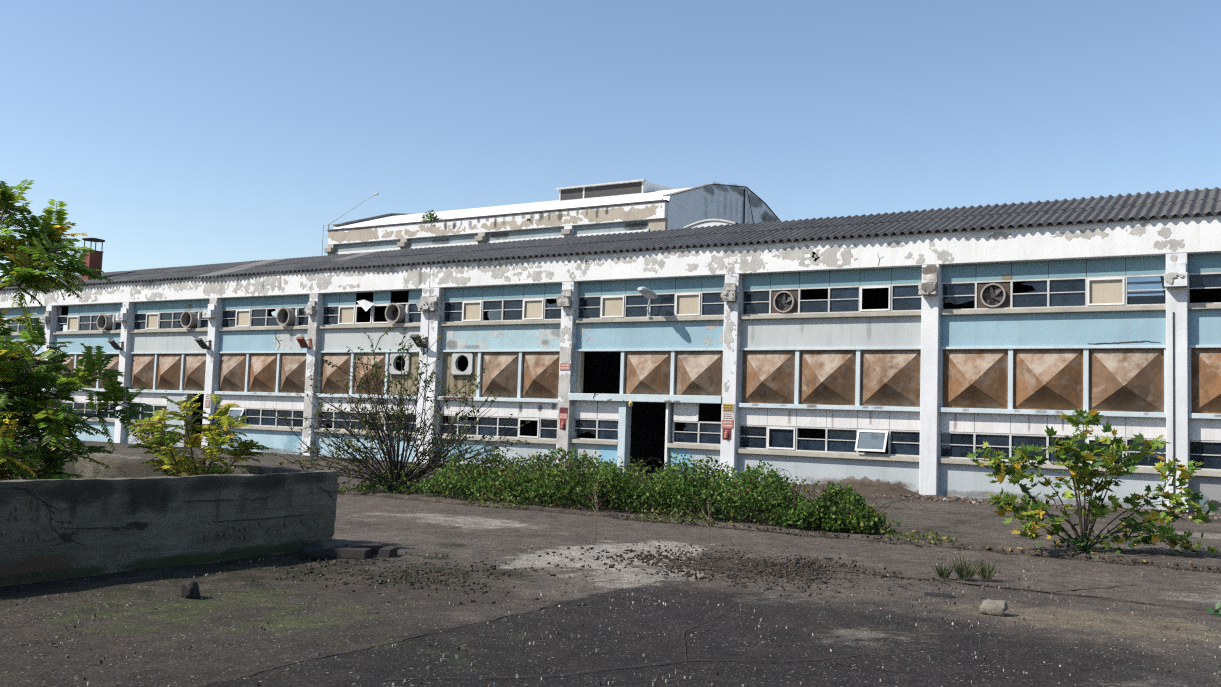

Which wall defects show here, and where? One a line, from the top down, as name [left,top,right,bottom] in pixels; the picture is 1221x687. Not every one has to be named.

peeling [328,204,662,243]
peeling [885,240,954,292]
peeling [1051,228,1109,241]
peeling [1126,219,1185,284]
peeling [535,307,593,467]
damp [5,454,173,509]
damp [191,466,285,492]